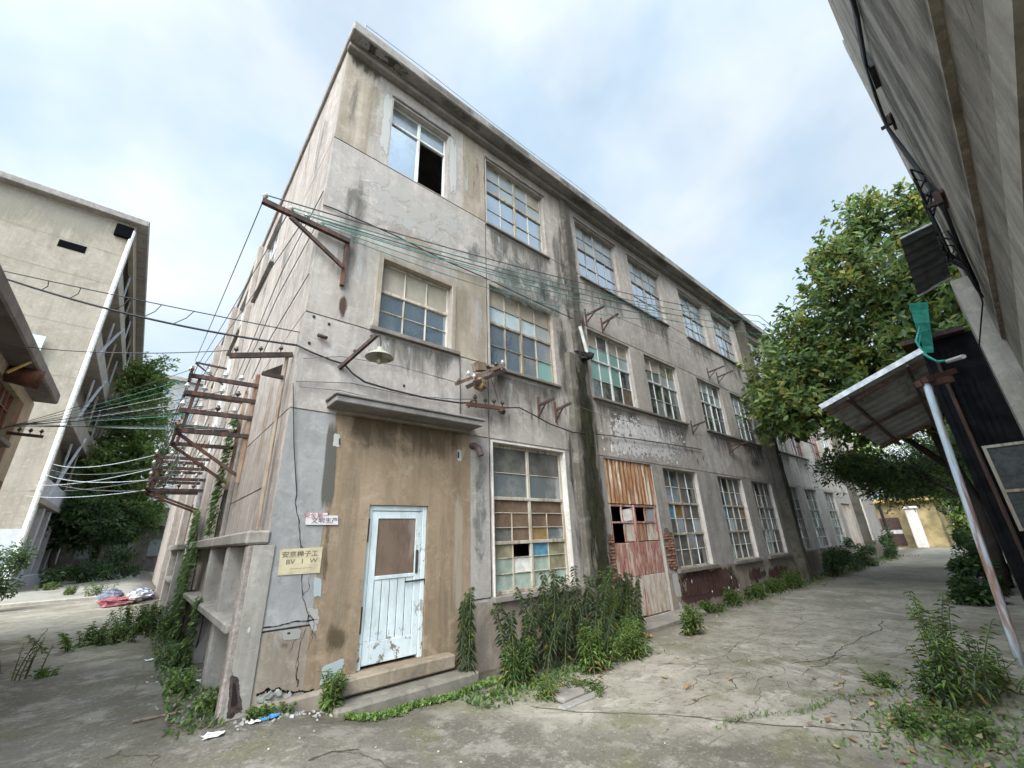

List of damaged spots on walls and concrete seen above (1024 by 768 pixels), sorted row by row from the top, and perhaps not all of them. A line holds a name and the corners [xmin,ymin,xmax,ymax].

damp [429,79,480,130]
damp [347,189,363,256]
peeling [600,413,686,465]
damp [576,363,646,610]
peeling [663,528,790,605]
damp [328,628,342,646]